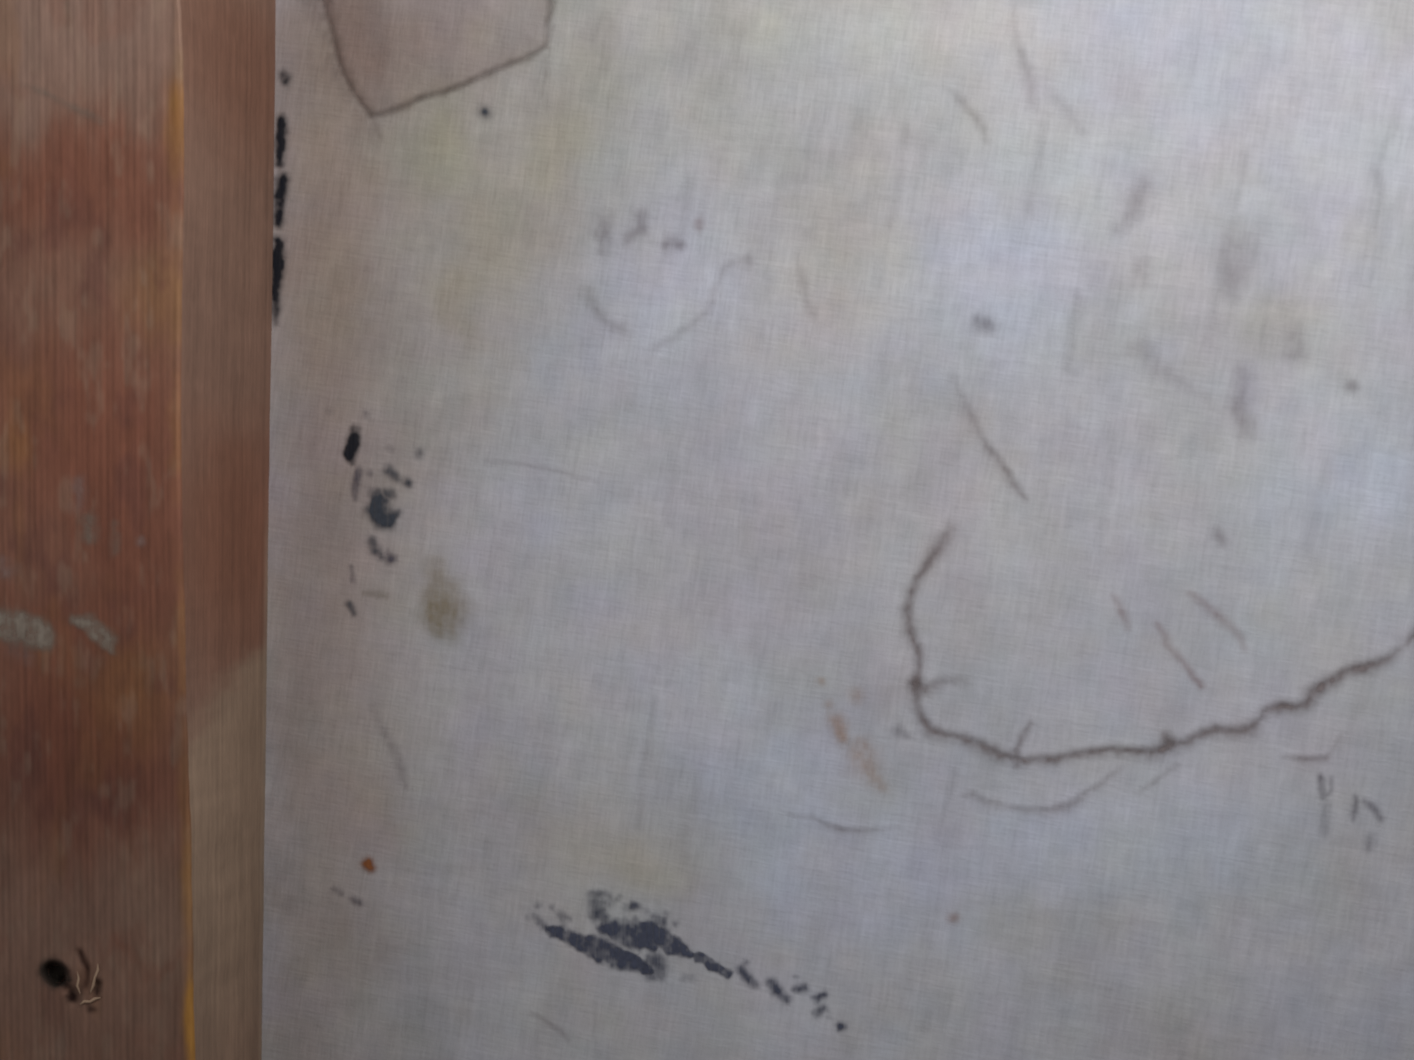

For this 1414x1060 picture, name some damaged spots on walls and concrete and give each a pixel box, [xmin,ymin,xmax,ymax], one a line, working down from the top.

crack [906,549,1389,763]